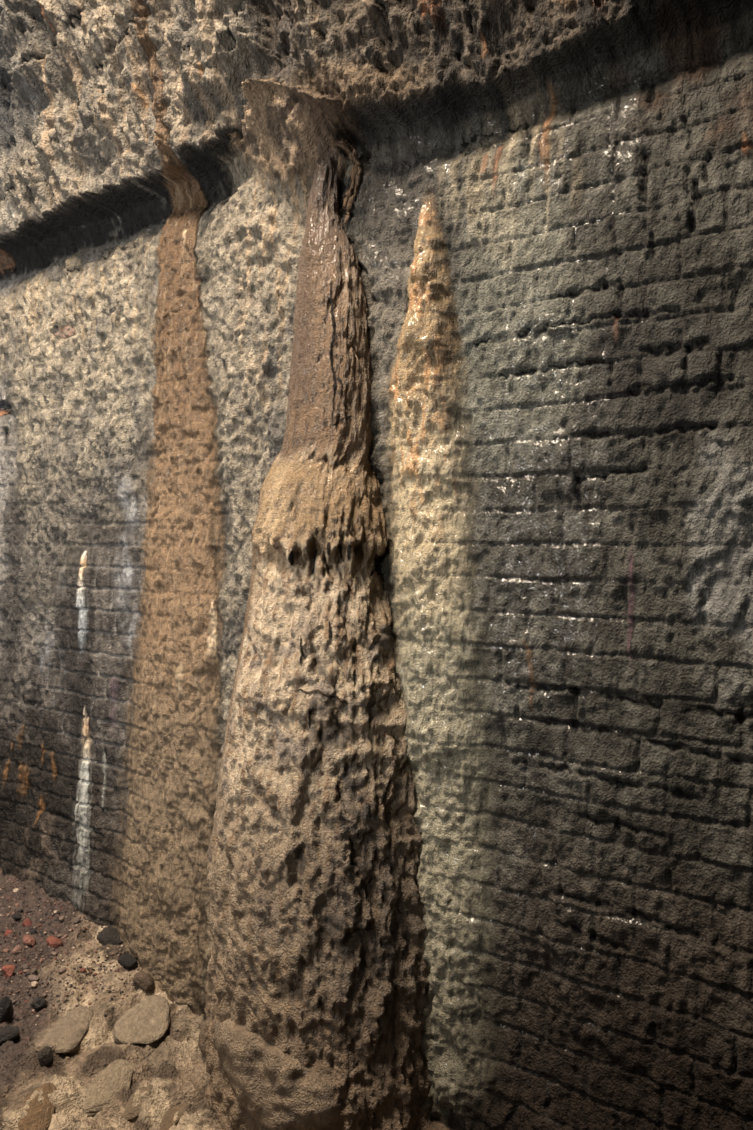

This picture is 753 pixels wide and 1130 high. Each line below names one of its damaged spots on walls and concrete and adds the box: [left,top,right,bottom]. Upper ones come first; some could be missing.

corrosion [539,91,556,169]
water stain [194,151,312,802]
water stain [375,625,397,660]
water stain [299,699,351,753]
corrosion [3,725,57,824]
water stain [72,708,106,908]
water stain [343,766,375,821]
water stain [293,844,311,872]